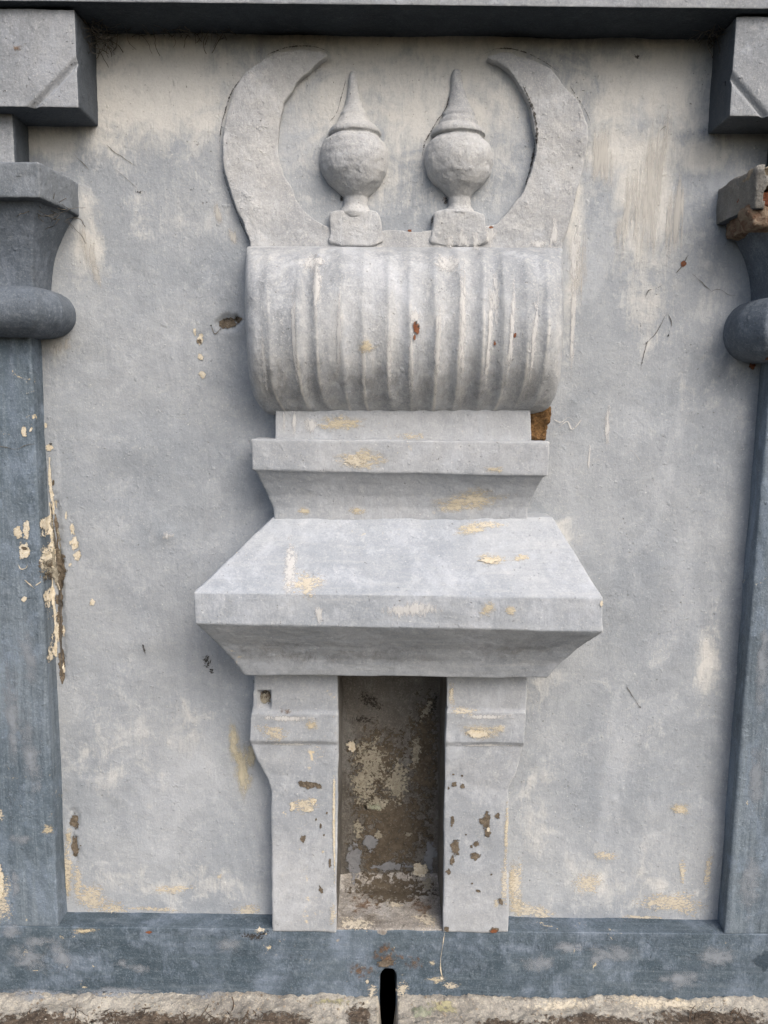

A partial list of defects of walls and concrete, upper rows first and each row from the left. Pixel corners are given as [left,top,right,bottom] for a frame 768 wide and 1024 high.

spalling [726,167,768,241]
spalling [193,316,242,379]
spalling [14,443,81,684]
peeling [290,682,553,918]
peeling [331,905,374,930]
peeling [411,912,437,933]